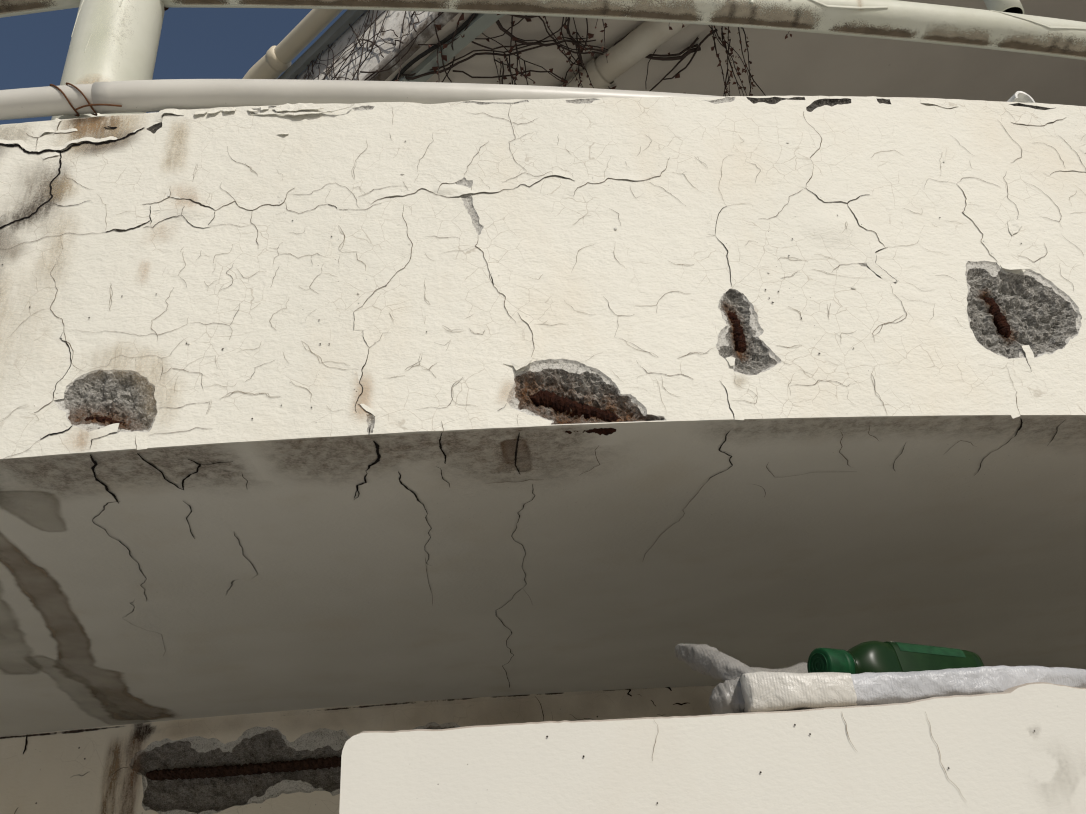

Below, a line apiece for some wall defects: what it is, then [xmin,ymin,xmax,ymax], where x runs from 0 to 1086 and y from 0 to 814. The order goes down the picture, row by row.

peeling [194,103,375,116]
peeling [701,97,851,112]
crack [921,98,958,109]
damp [13,178,68,226]
spalling [716,288,782,376]
spalling [965,261,1082,359]
spalling [54,369,158,435]
crack [0,105,1086,688]
spalling [503,355,667,436]
damp [0,543,92,677]
damp [0,671,173,754]
spalling [129,726,351,814]